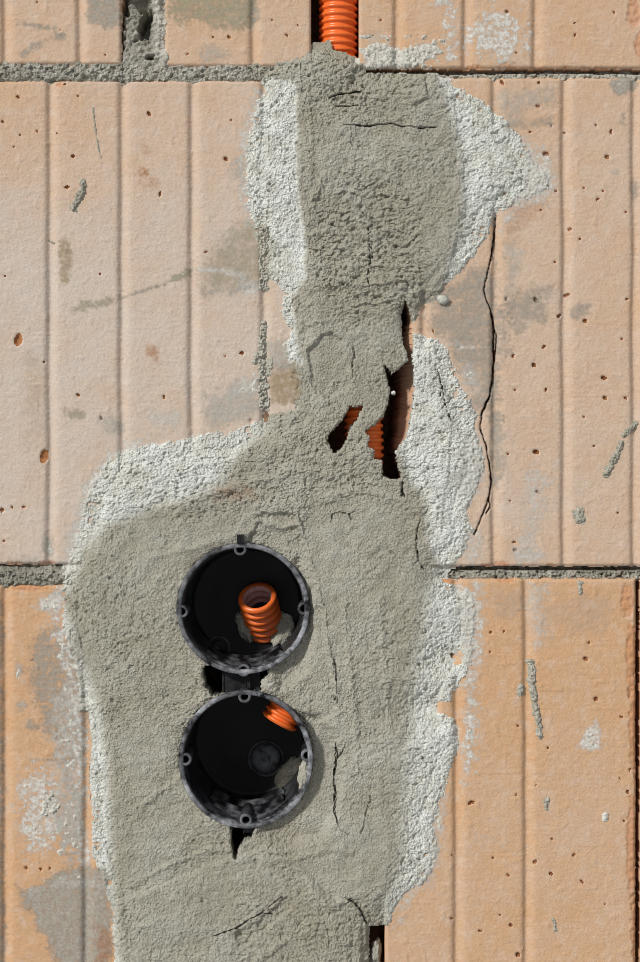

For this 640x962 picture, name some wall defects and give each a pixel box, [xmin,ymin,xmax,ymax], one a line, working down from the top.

crack [329,91,436,129]
hole [382,354,415,479]
crack [473,220,497,535]